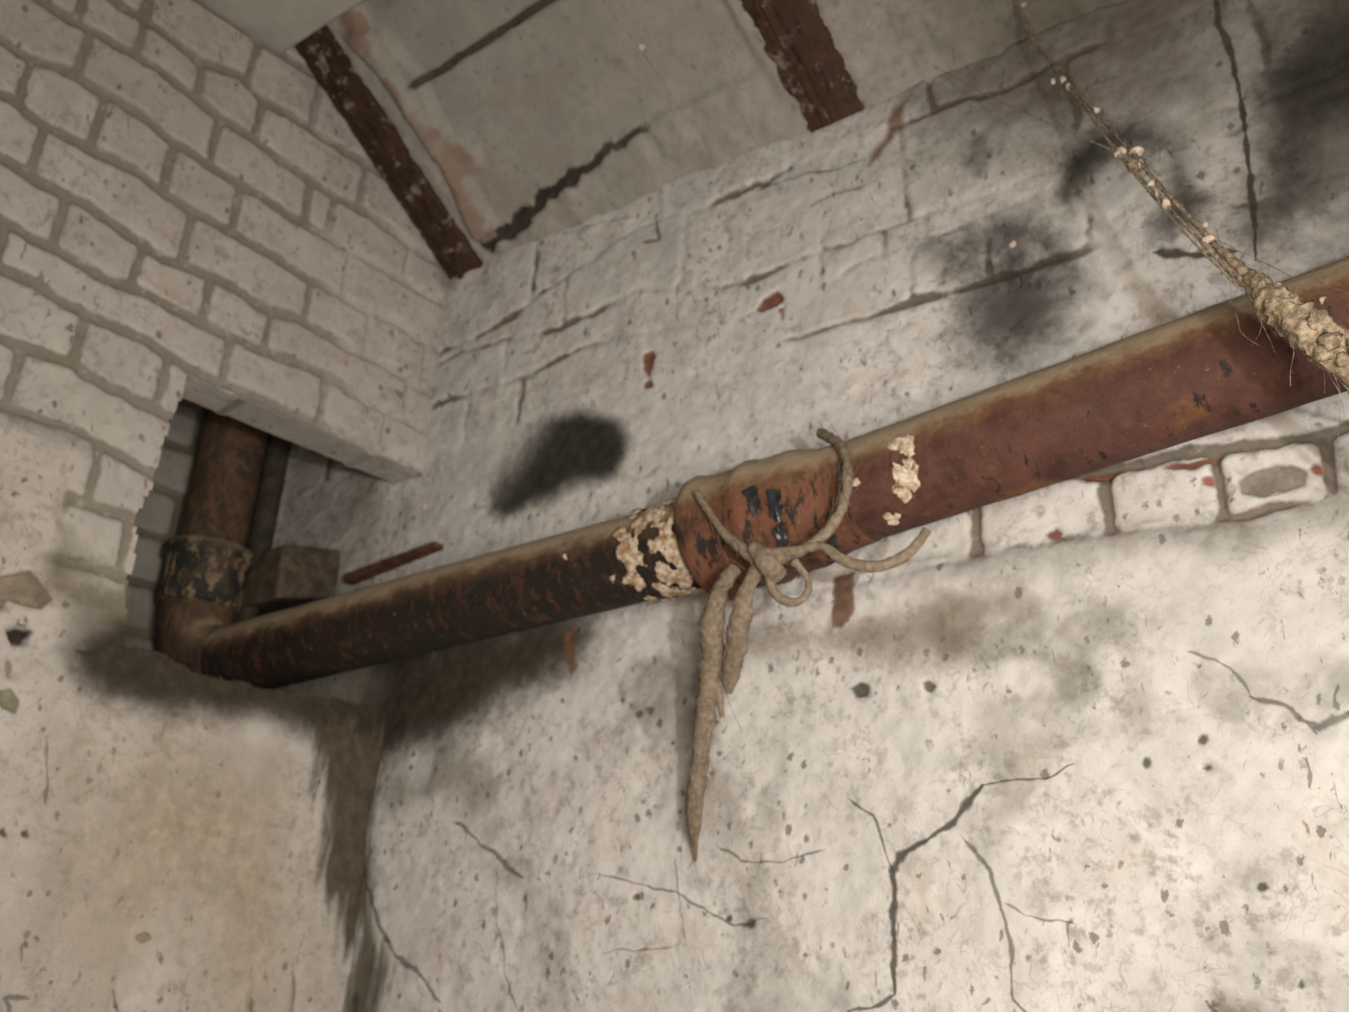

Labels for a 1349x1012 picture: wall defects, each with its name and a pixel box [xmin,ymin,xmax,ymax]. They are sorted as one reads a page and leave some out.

crack [1152,0,1258,261]
peeling [0,662,19,714]
spalling [6,630,30,645]
peeling [0,571,51,609]
water stain [75,618,589,1012]
crack [847,763,1075,1012]